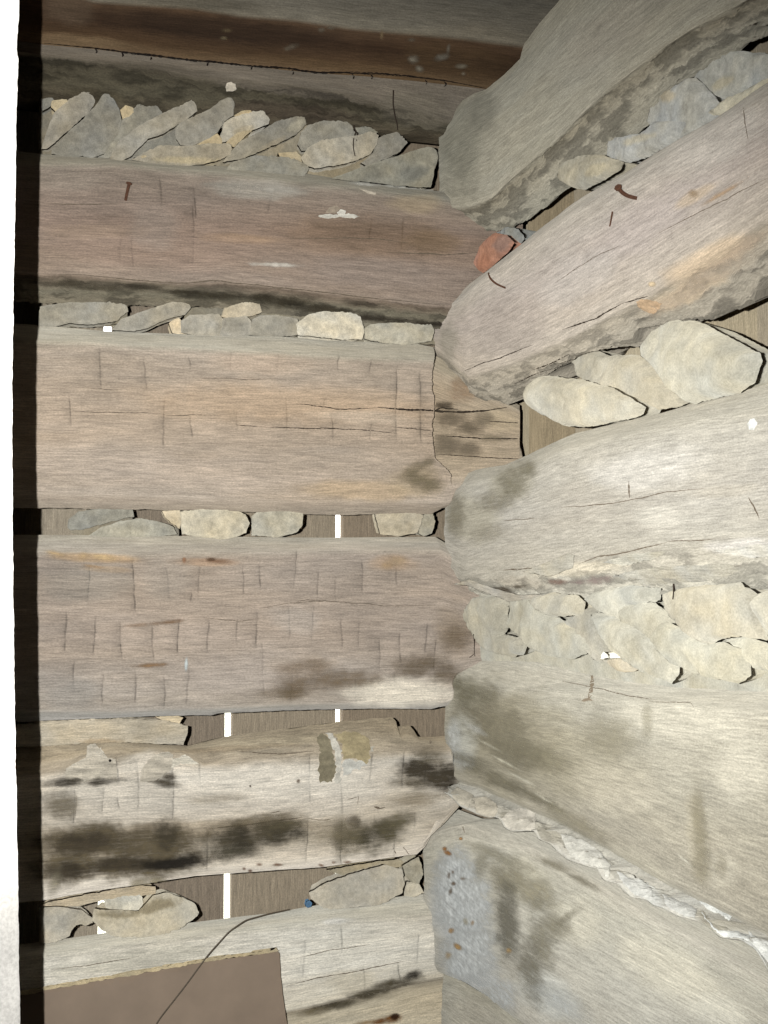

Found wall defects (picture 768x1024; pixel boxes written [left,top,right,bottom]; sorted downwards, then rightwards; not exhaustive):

crack [46,43,483,88]
crack [661,178,768,232]
crack [562,296,648,330]
crack [465,345,569,384]
crack [240,404,518,459]
crack [579,539,711,564]
peeling [317,731,374,784]
leakage [97,854,201,885]
leakage [214,848,247,859]
peeling [445,782,768,971]
leakage [497,892,567,999]